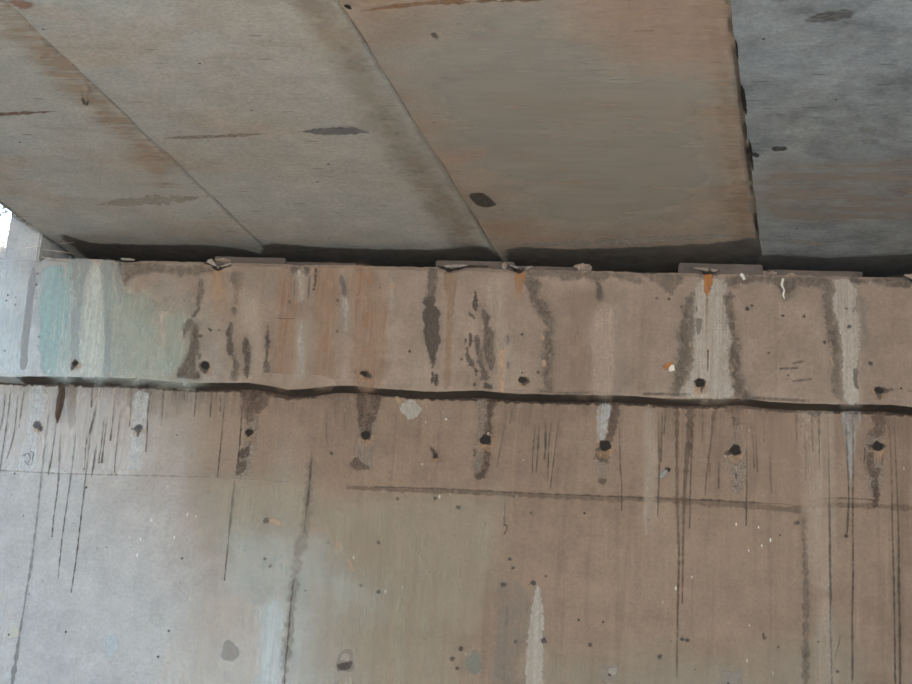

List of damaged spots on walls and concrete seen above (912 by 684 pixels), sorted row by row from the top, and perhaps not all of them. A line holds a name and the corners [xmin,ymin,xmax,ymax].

corrosion [704,274,713,296]